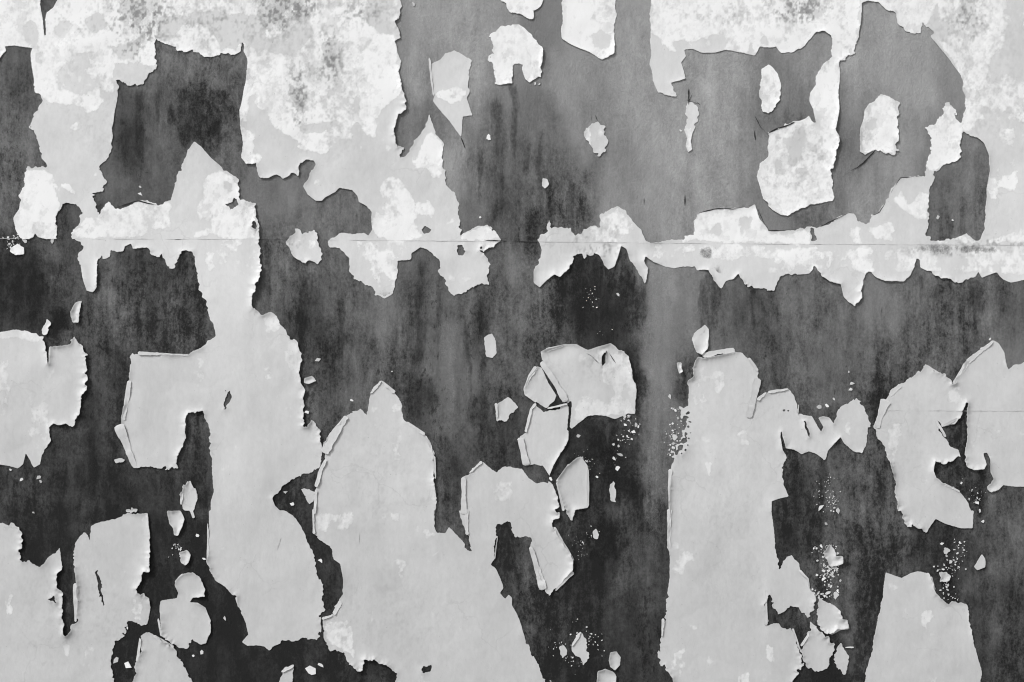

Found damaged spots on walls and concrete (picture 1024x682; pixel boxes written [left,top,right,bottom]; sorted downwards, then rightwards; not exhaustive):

peeling [534,0,1024,306]
peeling [0,0,637,682]
peeling [657,325,1024,682]